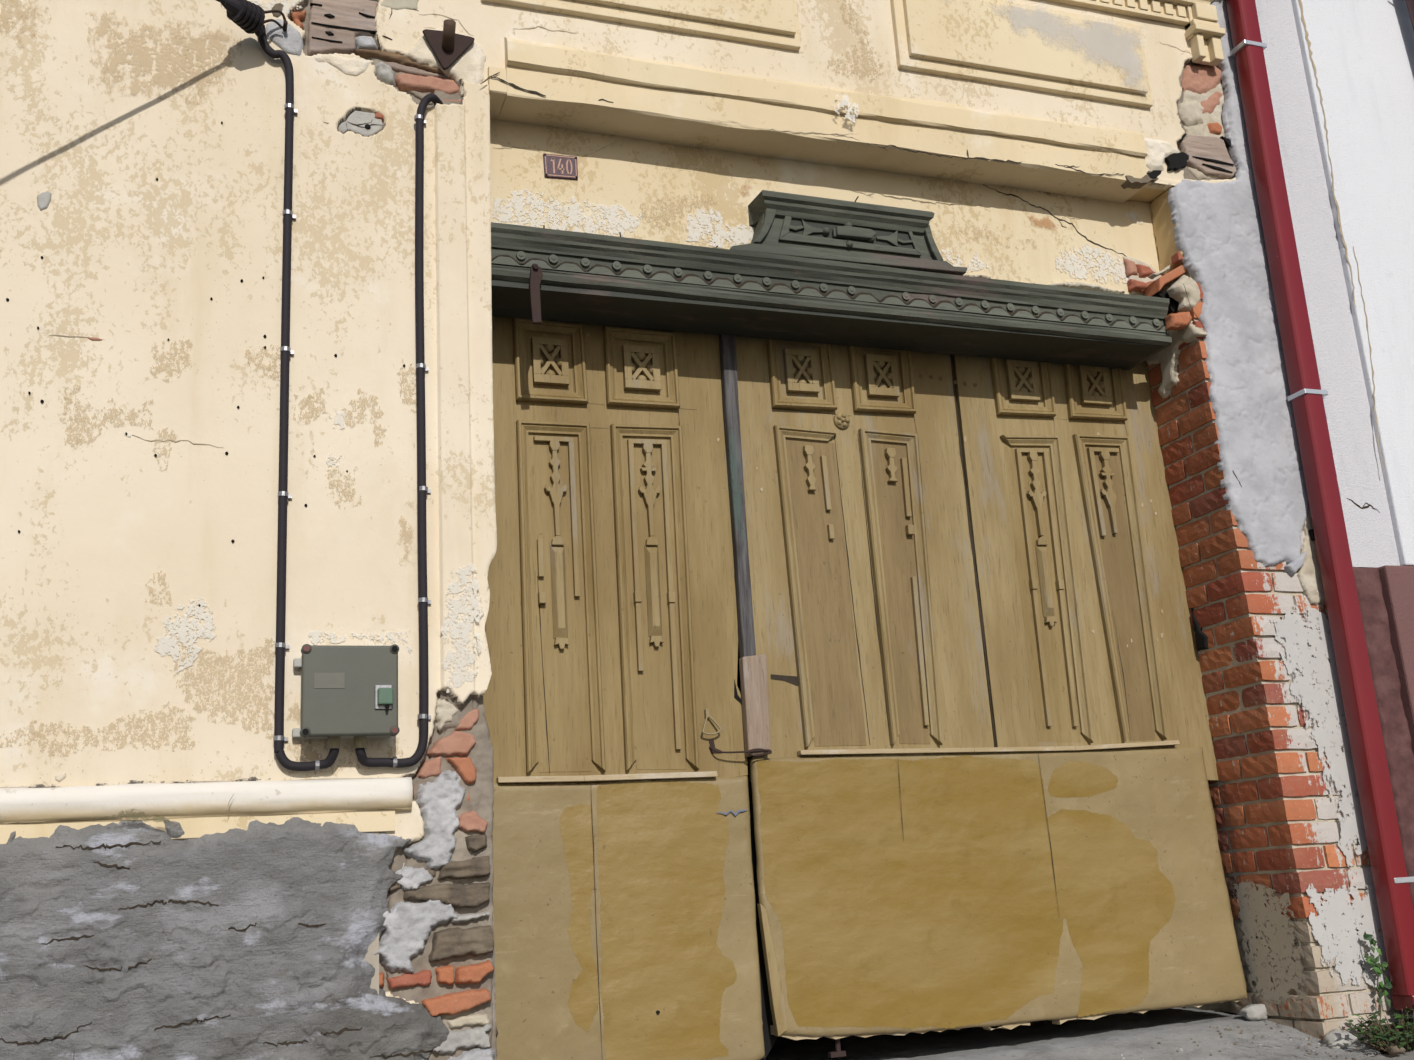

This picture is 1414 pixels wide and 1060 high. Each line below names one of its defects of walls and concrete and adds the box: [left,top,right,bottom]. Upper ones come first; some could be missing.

peeling [88,14,241,103]
spalling [249,0,461,104]
spalling [324,110,384,137]
spalling [1121,64,1237,189]
crack [711,120,1127,257]
peeling [1284,506,1326,605]
peeling [154,597,217,679]
spalling [371,564,495,1060]